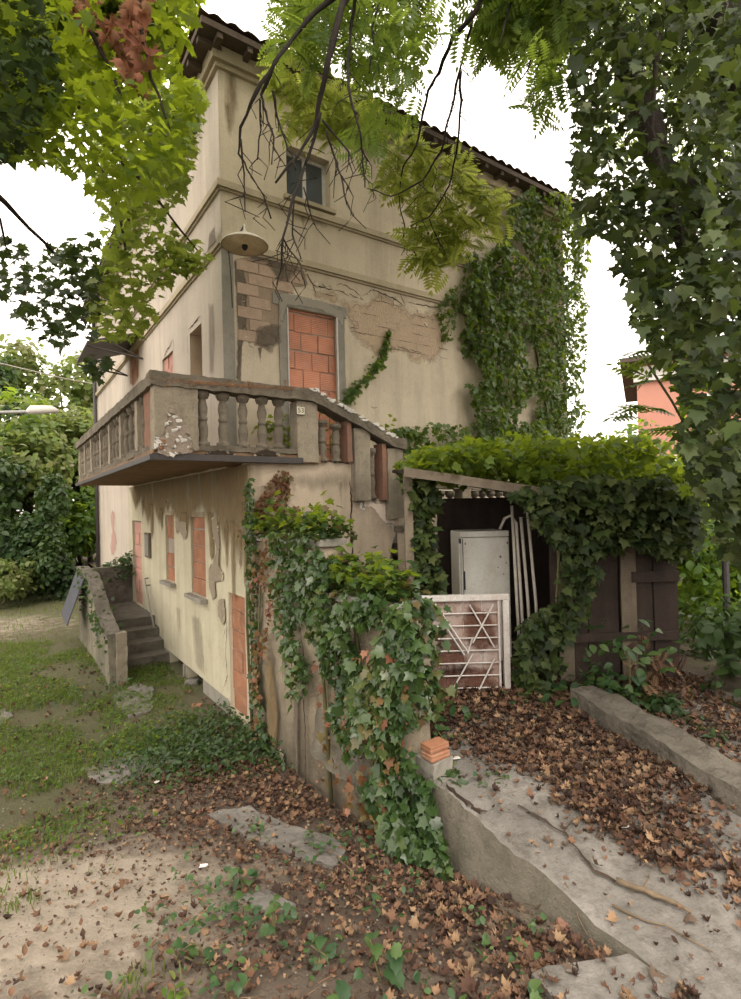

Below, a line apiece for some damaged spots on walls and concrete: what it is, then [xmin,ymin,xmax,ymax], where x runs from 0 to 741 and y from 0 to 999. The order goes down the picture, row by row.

leakage [234,261,344,381]
spalling [236,256,448,361]
crack [305,269,438,365]
spalling [154,408,236,458]
leakage [130,463,251,599]